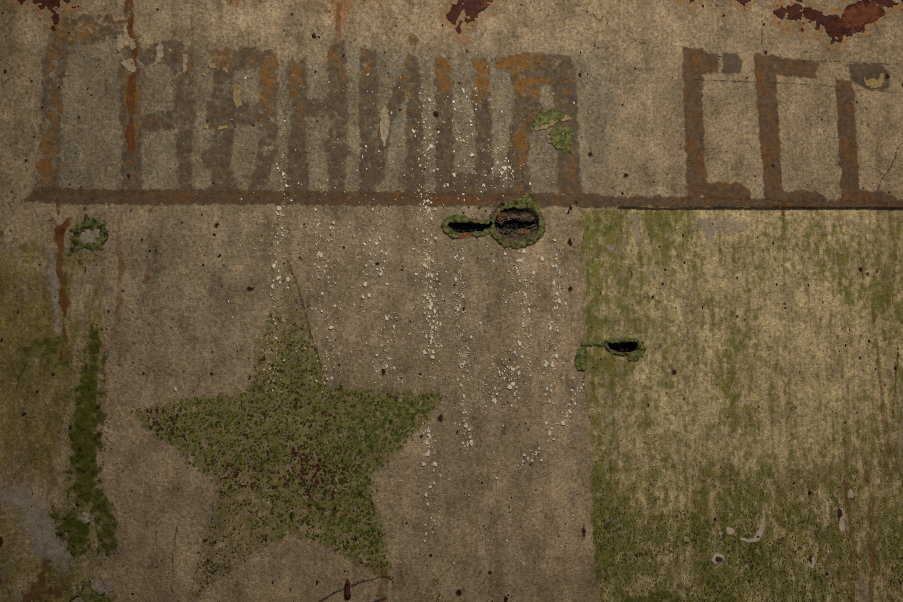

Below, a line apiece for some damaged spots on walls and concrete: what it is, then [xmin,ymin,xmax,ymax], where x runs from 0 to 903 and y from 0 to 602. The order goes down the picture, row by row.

peeling [2,0,94,34]
corrosion [53,198,70,358]
corrosion [106,0,139,153]
leakage [263,154,293,393]
leakage [305,205,341,393]
leakage [359,223,402,381]
leakage [412,87,438,174]
leakage [458,139,514,200]
spalling [436,181,546,271]
leakage [416,185,567,447]
spalling [574,337,659,371]
peeling [667,0,903,52]